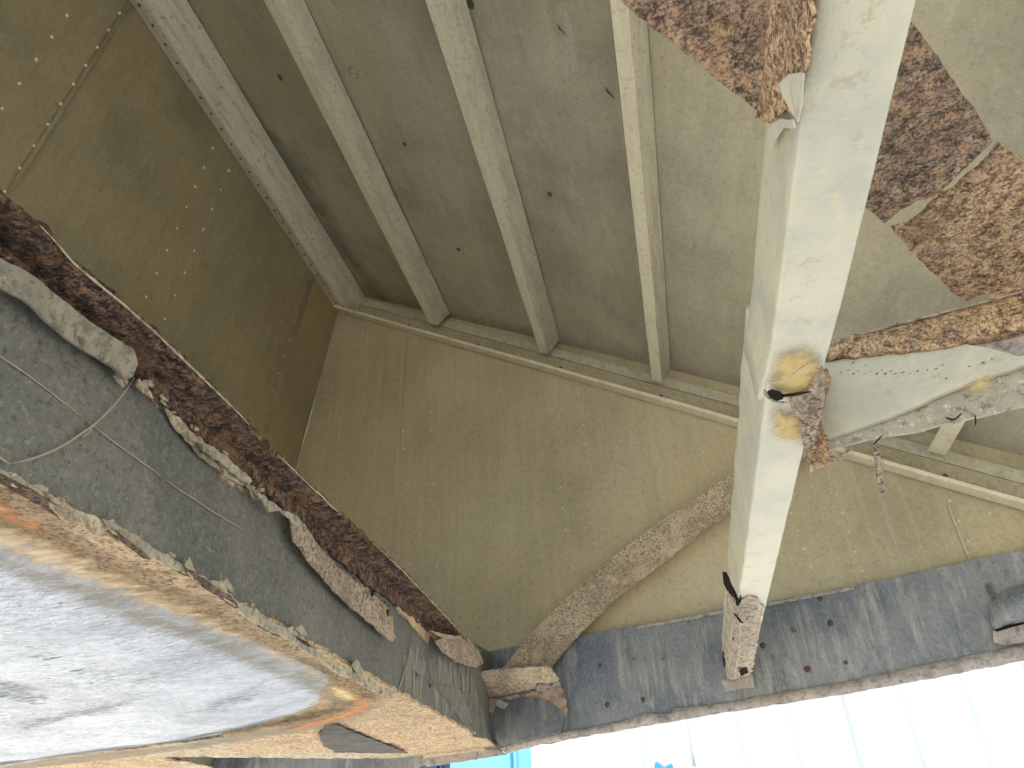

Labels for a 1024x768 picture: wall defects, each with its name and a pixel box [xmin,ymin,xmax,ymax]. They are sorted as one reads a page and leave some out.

spalling [755,0,817,151]
peeling [0,258,400,642]
peeling [0,469,396,699]
peeling [488,683,554,714]
spalling [721,571,765,680]